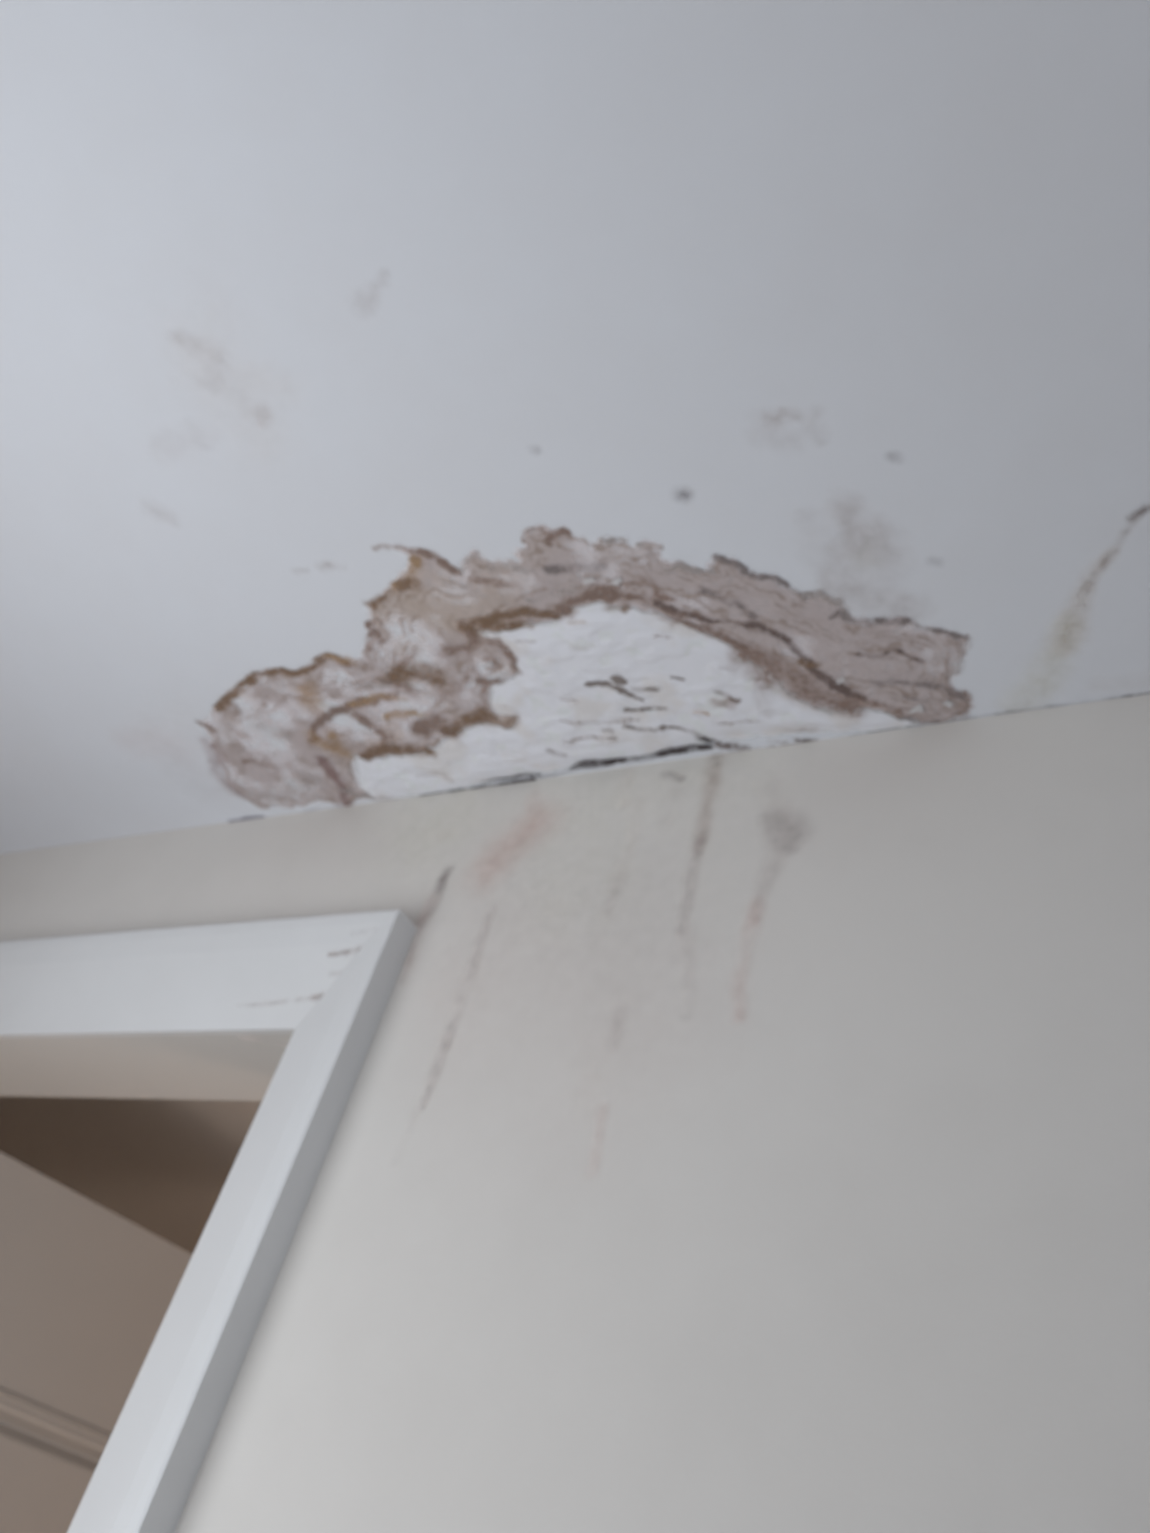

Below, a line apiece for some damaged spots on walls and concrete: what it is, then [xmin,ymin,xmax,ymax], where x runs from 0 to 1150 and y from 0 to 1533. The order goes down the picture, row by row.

flaking render [197,527,970,808]